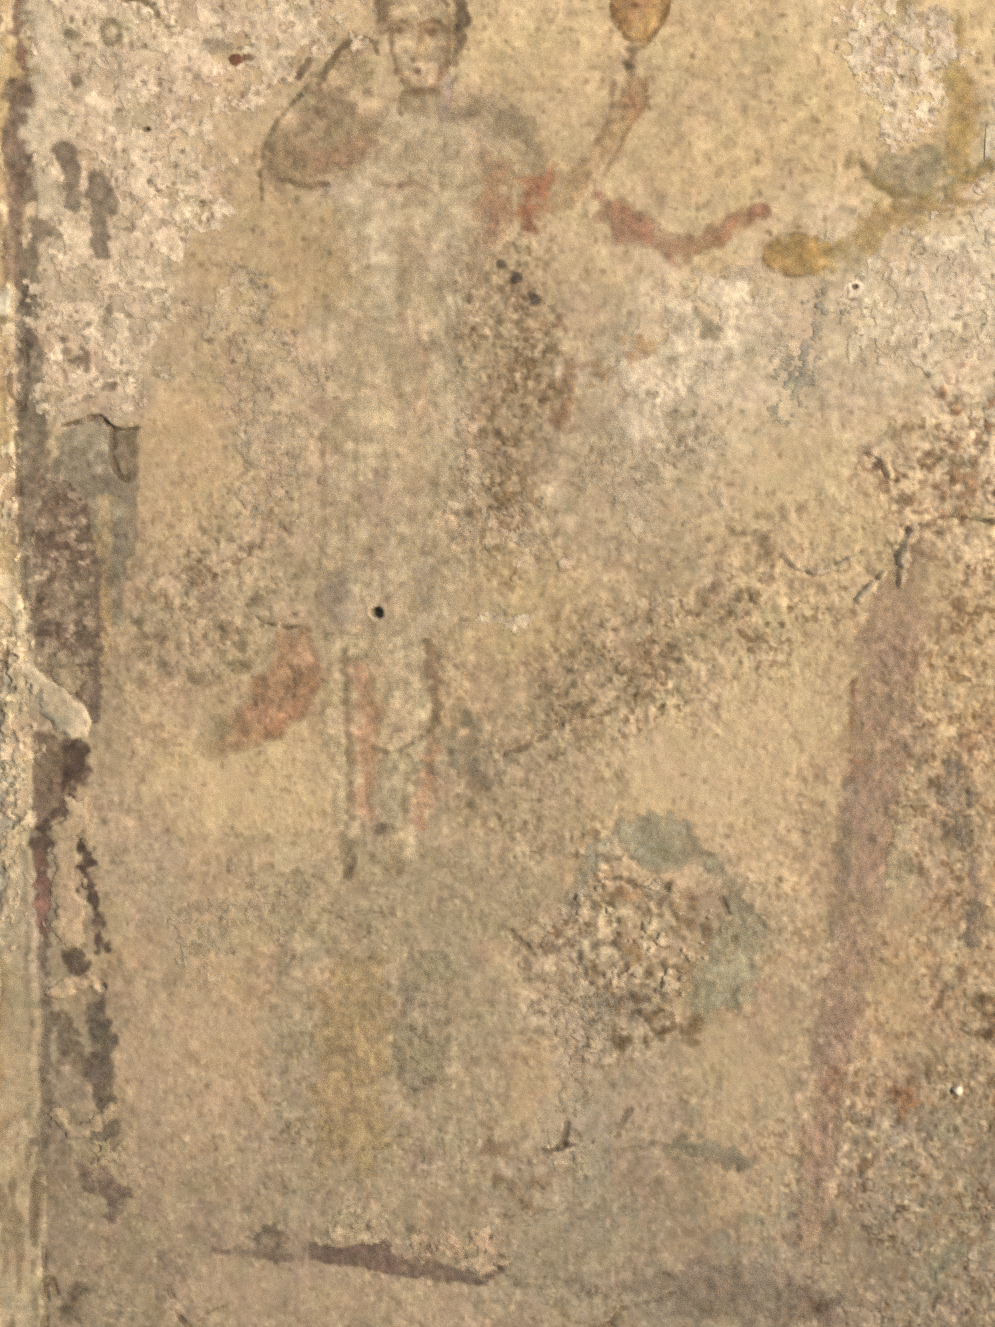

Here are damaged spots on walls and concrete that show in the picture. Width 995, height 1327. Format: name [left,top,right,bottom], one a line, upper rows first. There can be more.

leakage [32,219,61,242]
leakage [52,142,118,259]
peeling [0,0,369,427]
peeling [0,406,33,561]
leakage [63,337,90,372]
leakage [580,267,853,548]
peeling [0,654,45,952]
peeling [329,1206,390,1246]